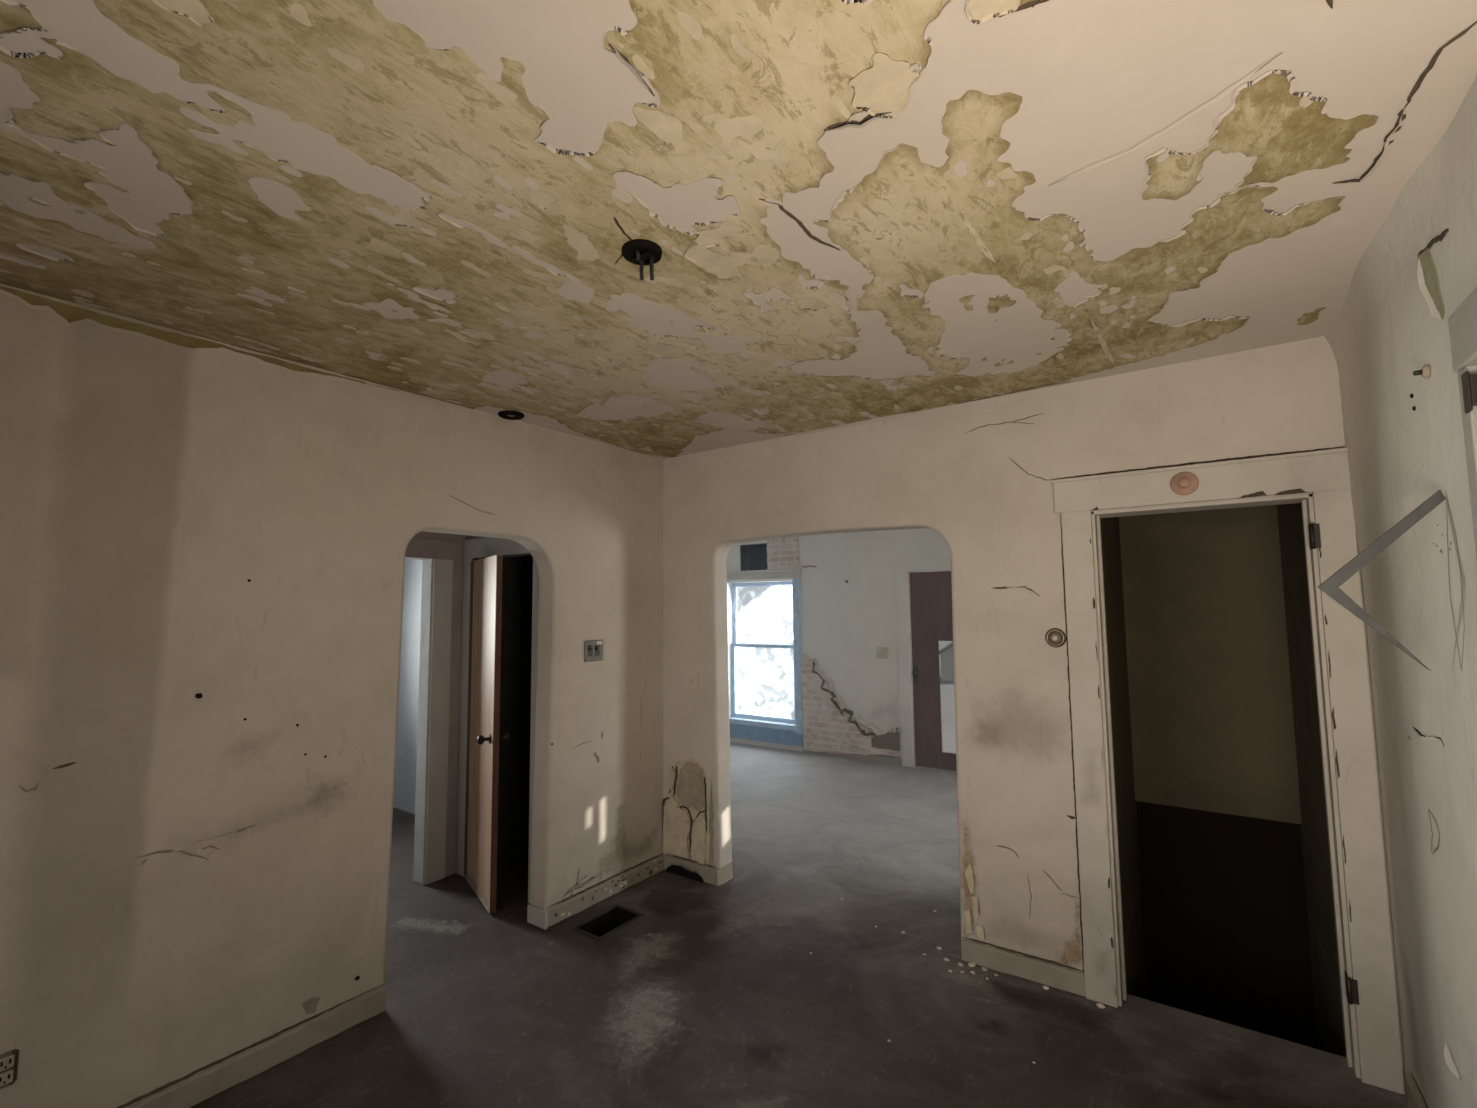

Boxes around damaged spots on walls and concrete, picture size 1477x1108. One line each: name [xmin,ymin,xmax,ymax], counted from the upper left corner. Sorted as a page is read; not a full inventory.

crack [1332,21,1477,184]
peeling [0,0,1379,458]
crack [759,198,840,250]
peeling [1417,229,1448,321]
spalling [554,758,710,917]
flaking render [964,862,986,940]